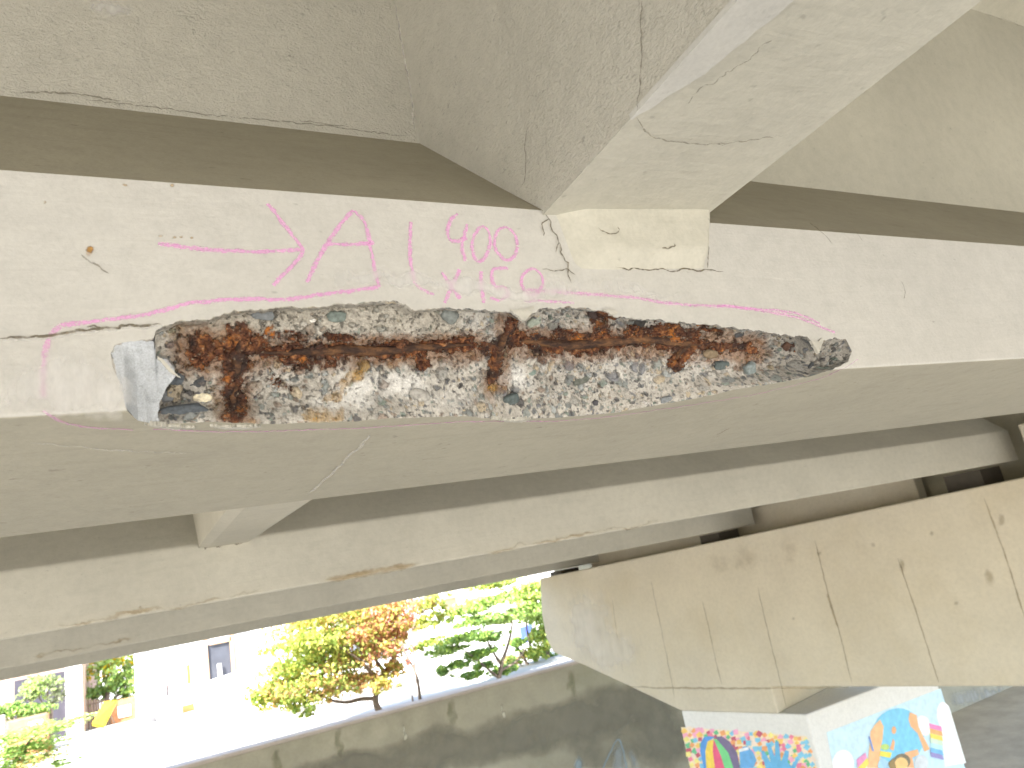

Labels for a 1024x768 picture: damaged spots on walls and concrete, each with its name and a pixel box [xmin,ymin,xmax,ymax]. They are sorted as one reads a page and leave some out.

crack [541,210,574,281]
crack [618,245,723,272]
crack [0,323,157,339]
spalling [111,300,852,430]